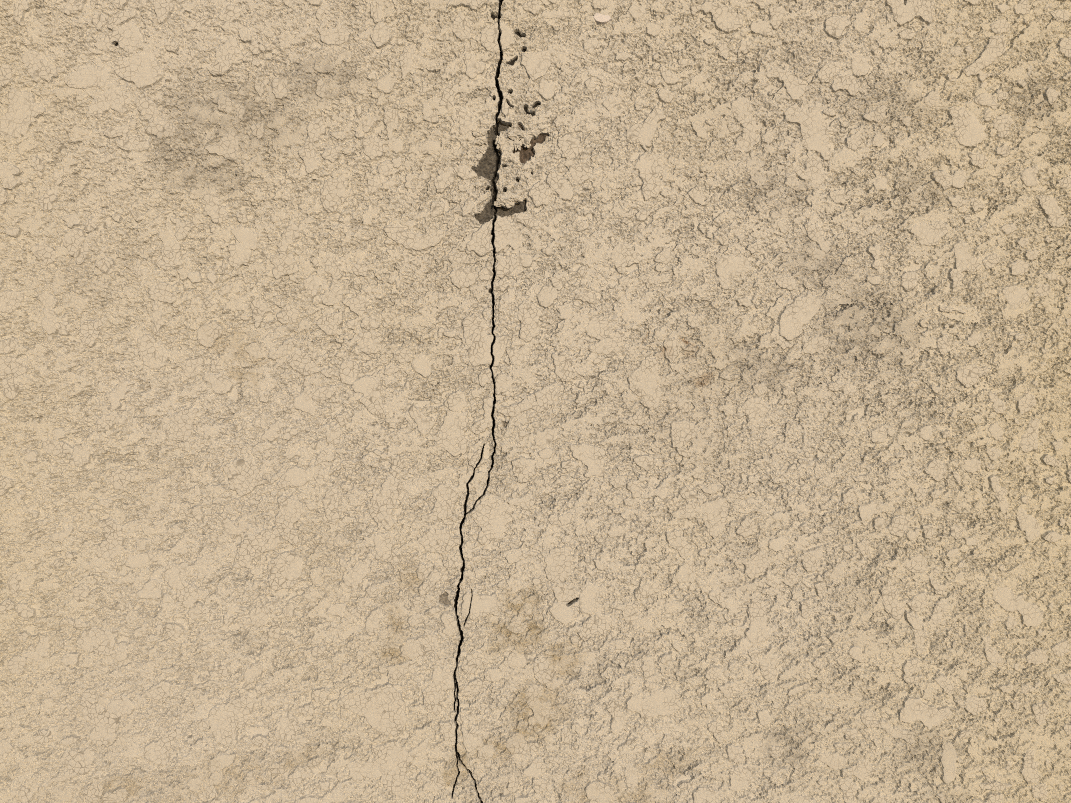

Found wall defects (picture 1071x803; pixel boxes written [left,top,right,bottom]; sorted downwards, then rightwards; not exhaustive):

crack [452,0,504,803]
spalling [471,121,549,224]